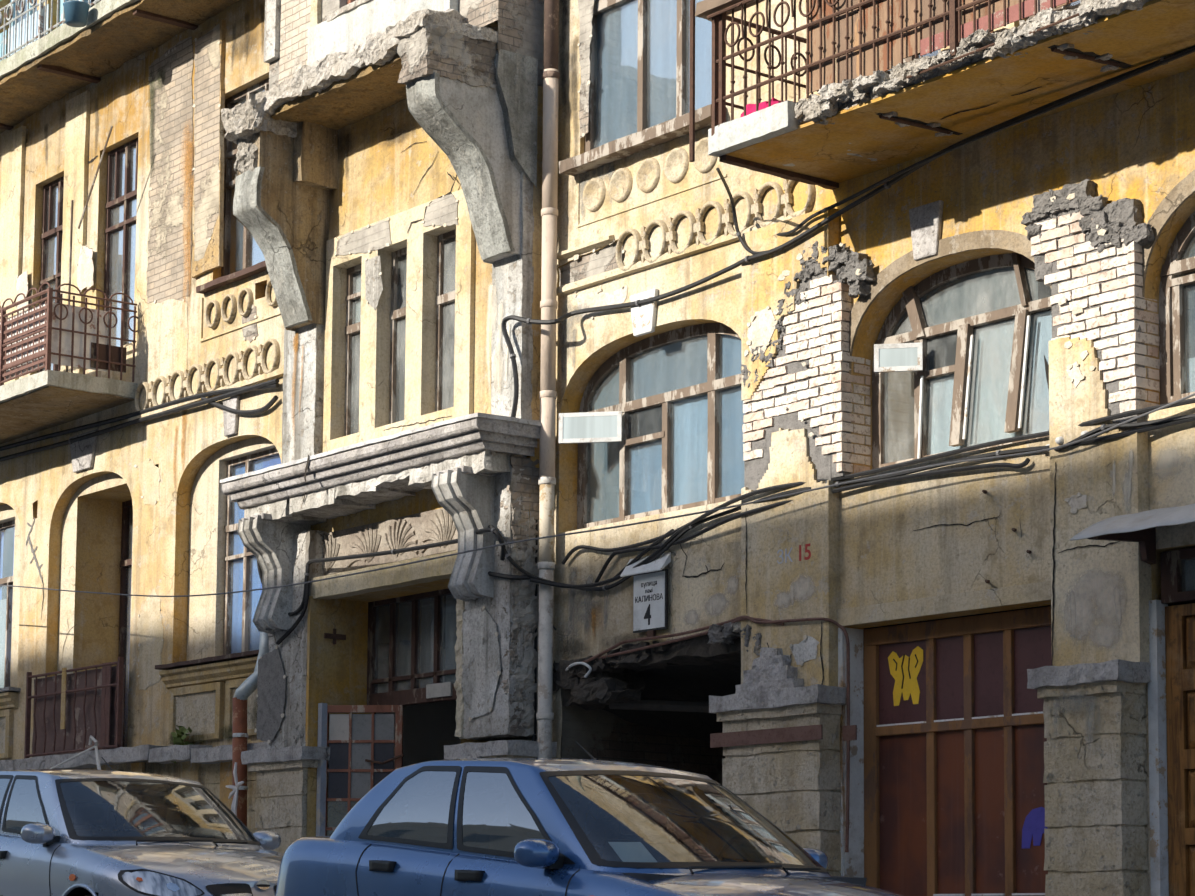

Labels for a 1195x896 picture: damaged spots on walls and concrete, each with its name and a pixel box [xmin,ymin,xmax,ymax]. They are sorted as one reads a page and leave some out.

spalling [146,8,498,310]
spalling [876,111,963,137]
spalling [794,0,1151,125]
spalling [741,241,876,478]
spalling [1021,191,1160,413]
crack [26,517,77,660]
spalling [454,455,679,740]
peeling [789,635,820,666]
crack [914,516,1022,537]
crack [1052,462,1120,666]